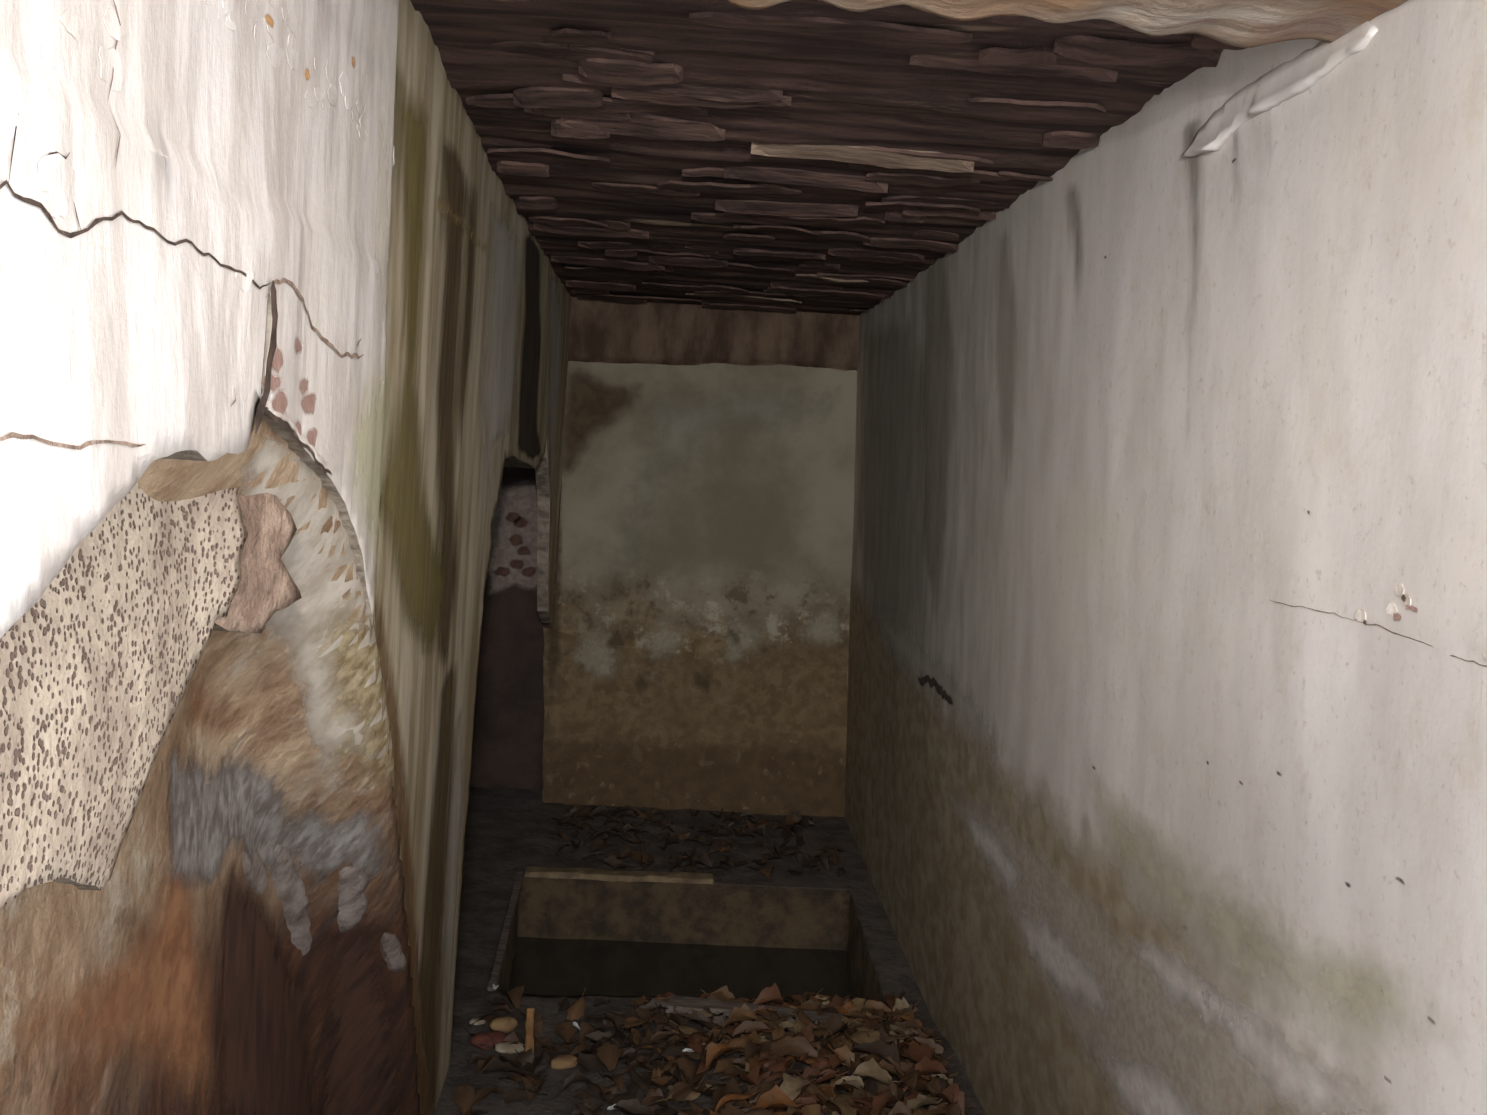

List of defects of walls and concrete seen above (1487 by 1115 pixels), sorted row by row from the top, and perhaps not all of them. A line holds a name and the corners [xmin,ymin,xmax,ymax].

peeling [0,110,22,140]
peeling [98,8,127,91]
peeling [205,0,372,141]
peeling [38,153,78,219]
crack [0,113,364,475]
peeling [235,269,254,292]
flaking render [488,480,537,594]
water stain [420,148,1356,1115]
crack [1269,599,1487,667]
spalling [0,338,420,1115]